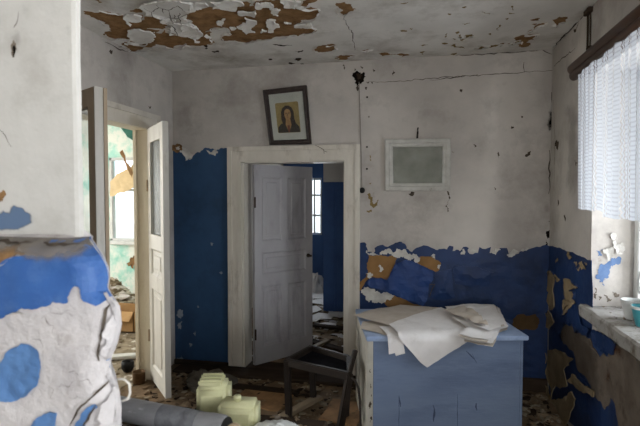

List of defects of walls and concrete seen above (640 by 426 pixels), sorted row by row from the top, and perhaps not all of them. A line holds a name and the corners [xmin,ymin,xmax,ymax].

flaking render [84,0,320,53]
flaking render [312,44,354,61]
flaking render [335,2,355,17]
crack [369,19,581,82]
flaking render [472,17,568,51]
peeling [0,236,119,365]
peeling [360,248,441,307]
peeling [594,233,625,302]
peeling [0,343,41,402]
peeling [31,412,57,426]
flaking render [75,374,118,426]
flaking render [512,271,640,426]